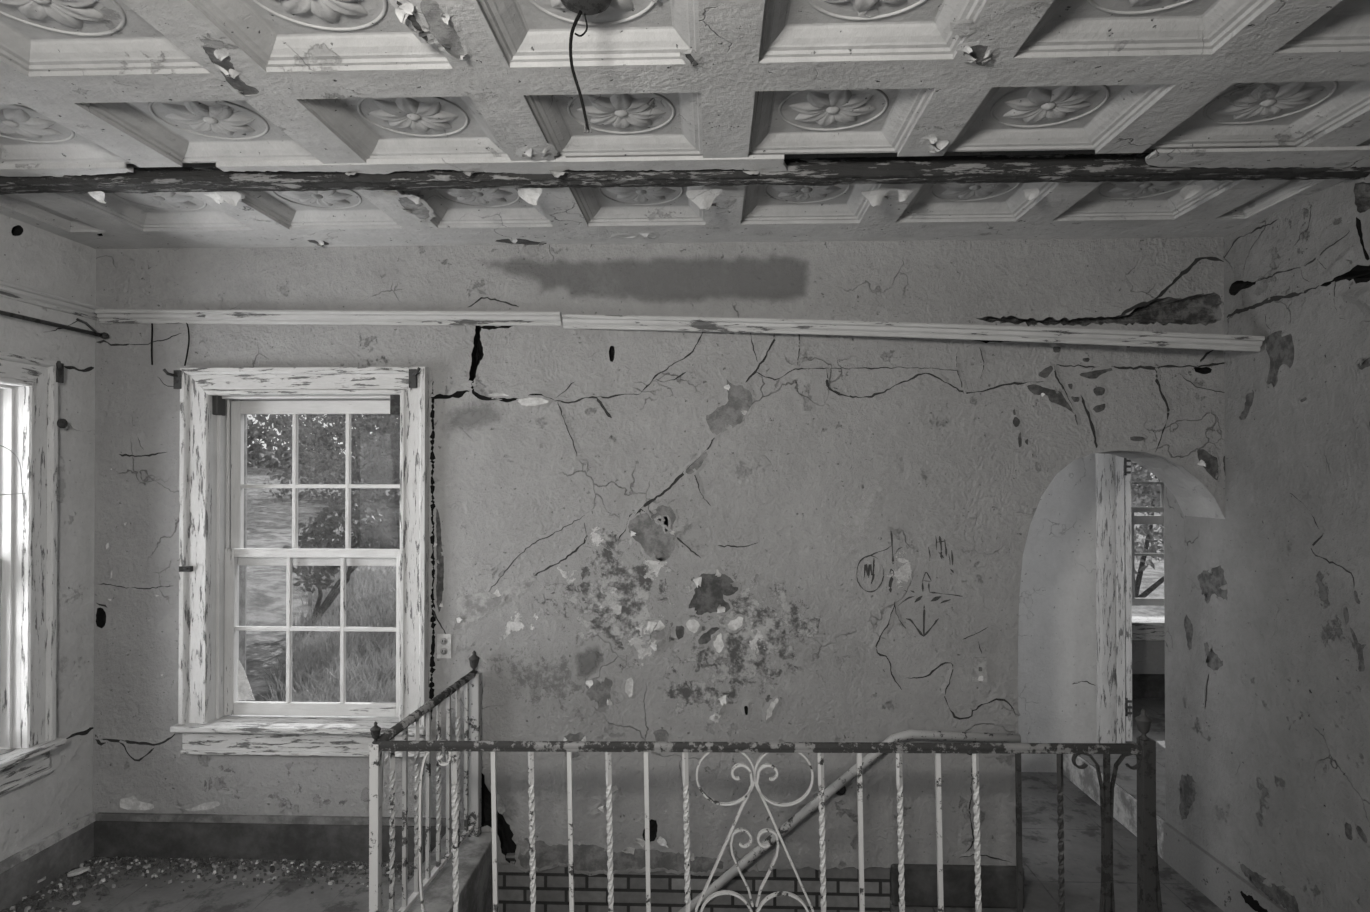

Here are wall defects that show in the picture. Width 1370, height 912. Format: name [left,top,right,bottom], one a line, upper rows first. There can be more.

peeling [196,42,267,97]
peeling [390,0,473,62]
crack [0,146,1370,210]
crack [1116,215,1370,331]
flaking render [683,375,756,477]
crack [742,333,1225,452]
peeling [1237,326,1299,424]
peeling [432,505,448,615]
crack [429,293,703,722]
crack [486,434,758,592]
peeling [478,501,822,762]
crack [871,601,1020,864]